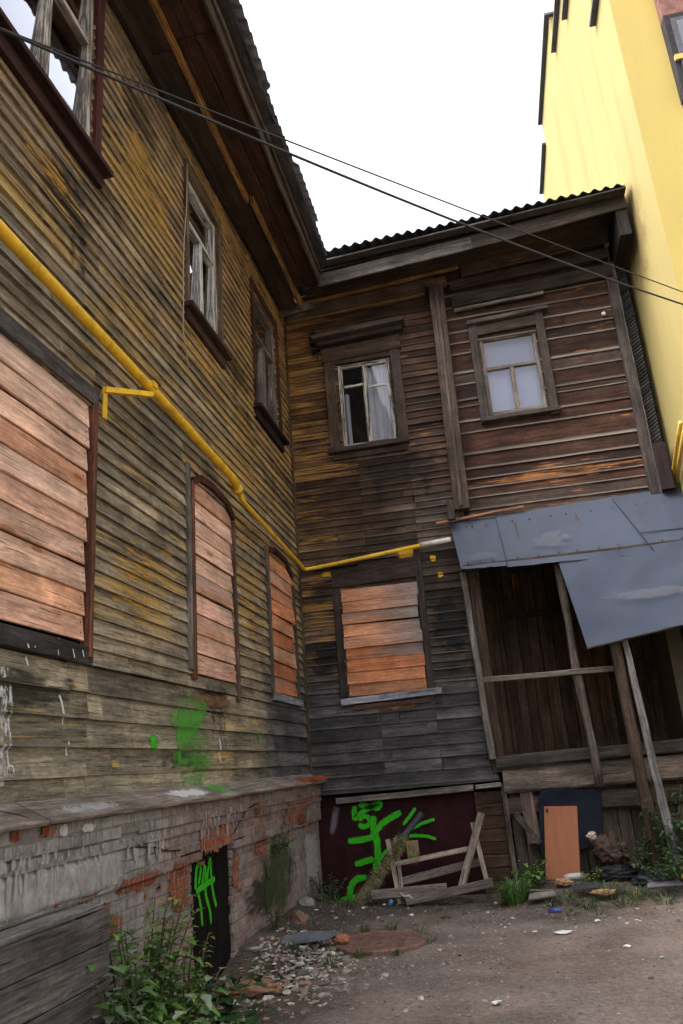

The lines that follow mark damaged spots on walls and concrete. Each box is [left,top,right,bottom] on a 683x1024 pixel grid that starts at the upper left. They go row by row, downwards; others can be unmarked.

flaking render [11,829,23,842]
flaking render [41,825,57,838]
flaking render [80,819,268,937]
leakage [246,869,276,916]